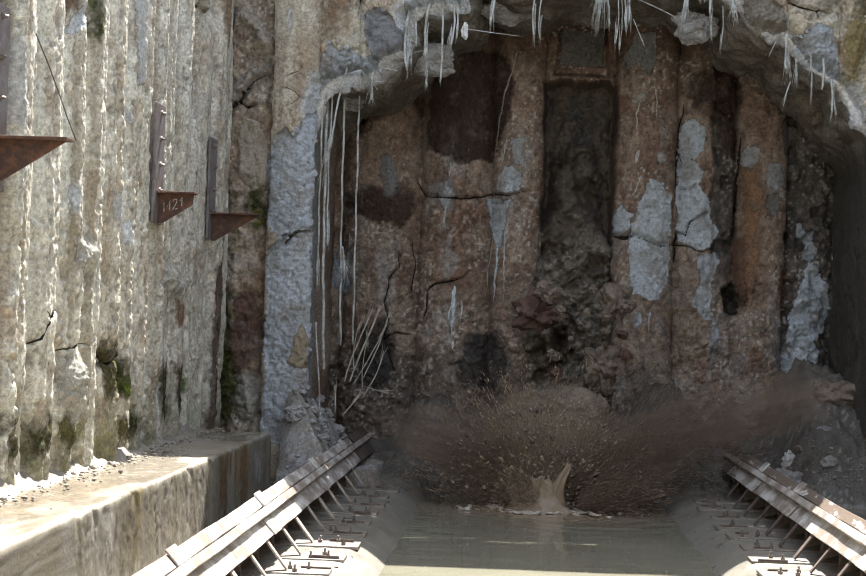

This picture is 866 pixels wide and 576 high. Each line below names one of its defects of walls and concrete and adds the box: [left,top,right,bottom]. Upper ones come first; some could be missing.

crack [232,76,265,109]
crack [417,180,531,205]
spalling [238,0,866,444]
crack [383,240,468,369]
crack [26,311,111,365]